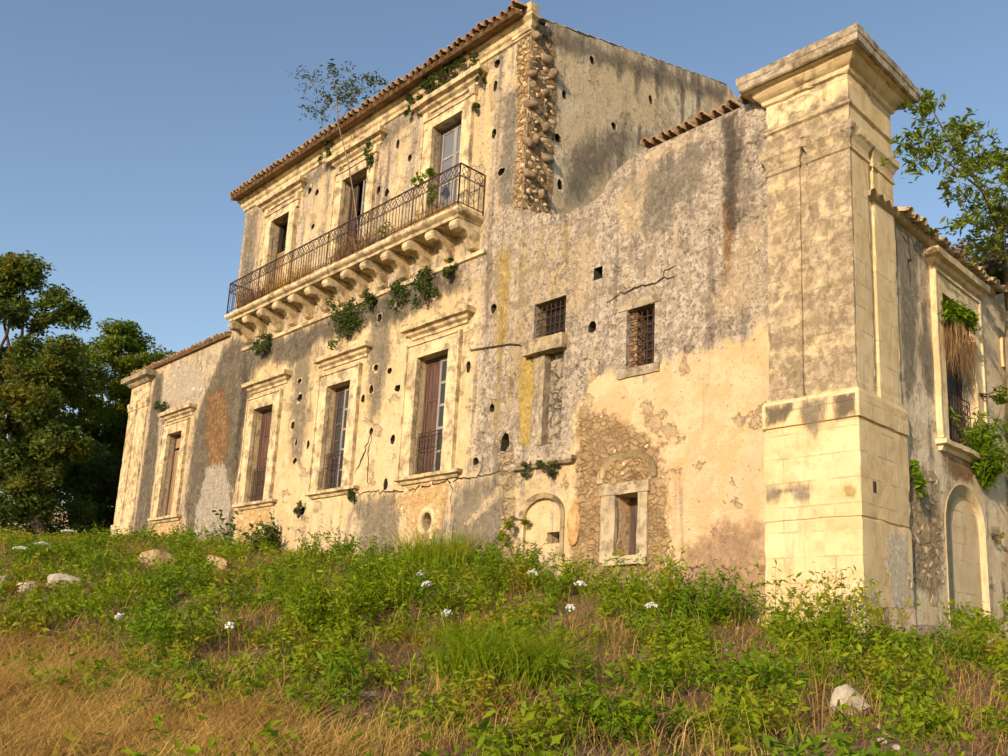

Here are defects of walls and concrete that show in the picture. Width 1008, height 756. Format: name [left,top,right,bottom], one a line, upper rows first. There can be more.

spalling [498,24,566,214]
damp [565,127,647,202]
damp [556,33,724,123]
damp [632,143,708,228]
damp [722,112,738,228]
crack [606,265,676,303]
damp [895,225,934,394]
damp [185,270,461,544]
crack [355,434,509,504]
flaking render [569,405,676,581]
flaking render [885,466,945,608]